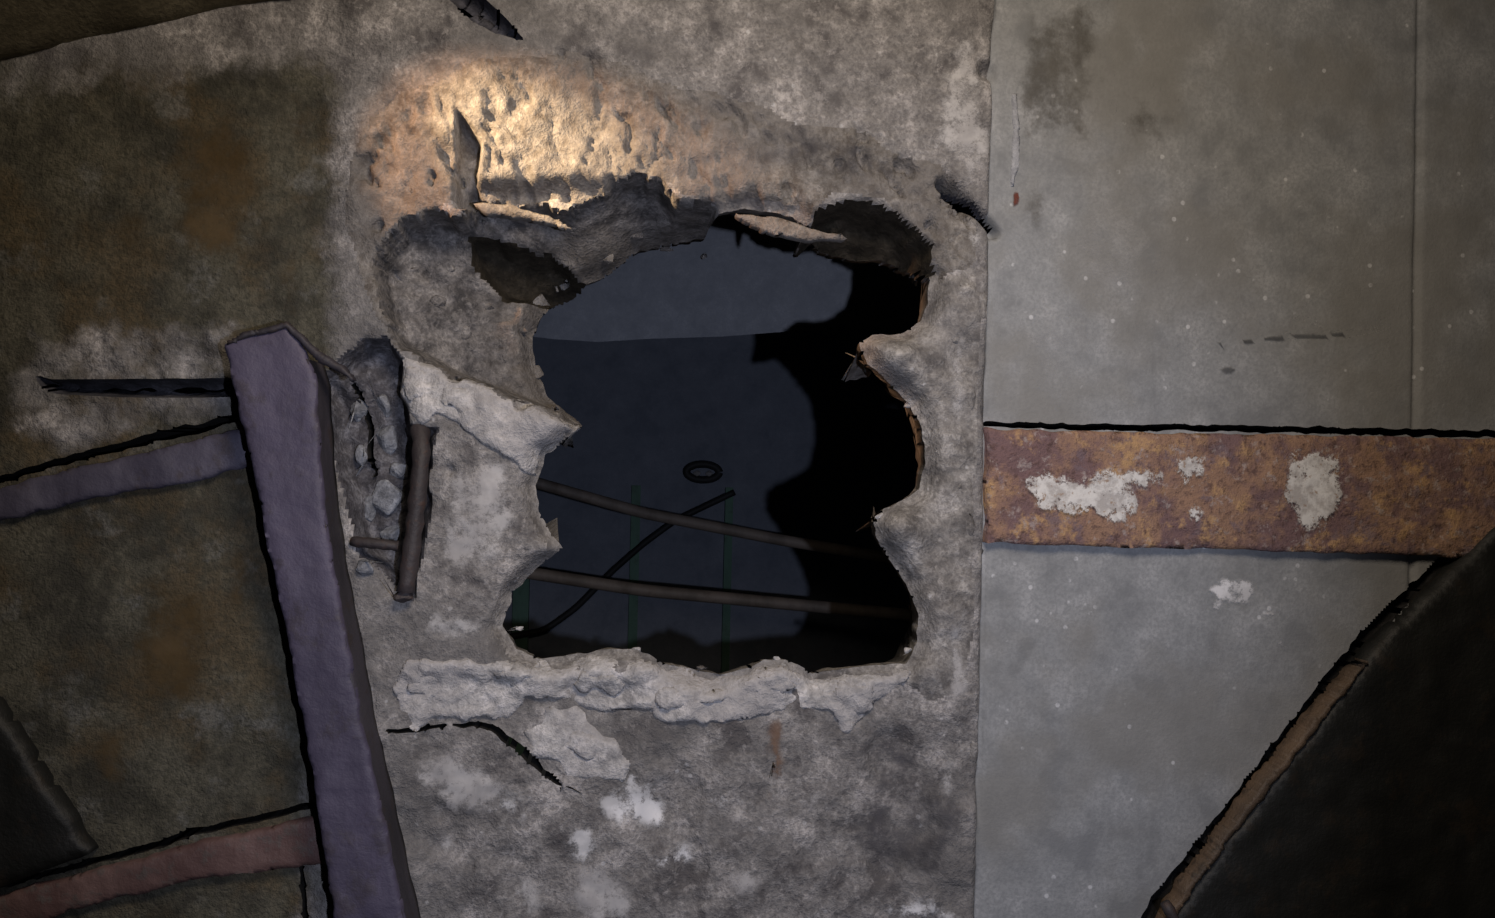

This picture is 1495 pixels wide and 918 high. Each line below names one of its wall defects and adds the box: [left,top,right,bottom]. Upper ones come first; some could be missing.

spalling [326,172,988,782]
leakage [1210,580,1253,606]
crack [386,721,580,793]
leakage [601,775,663,825]